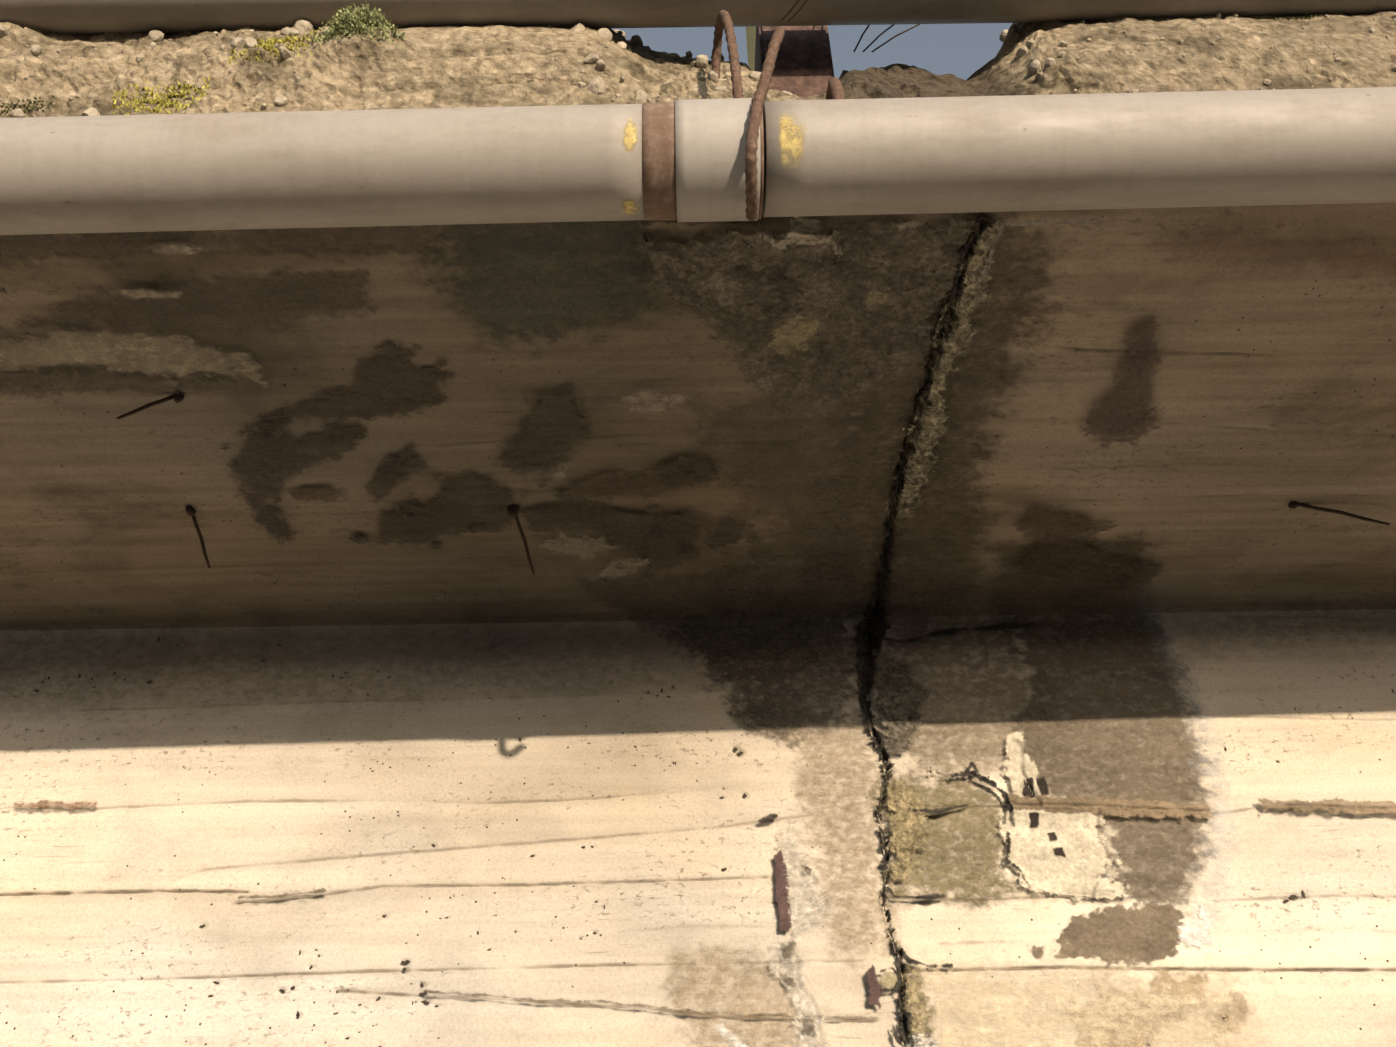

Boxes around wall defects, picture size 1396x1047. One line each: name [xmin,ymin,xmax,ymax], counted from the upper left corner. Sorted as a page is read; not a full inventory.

corrosion [642,102,677,221]
leakage [220,343,454,540]
crack [423,216,1102,1047]
leakage [349,211,1246,1047]
spalling [999,732,1130,901]